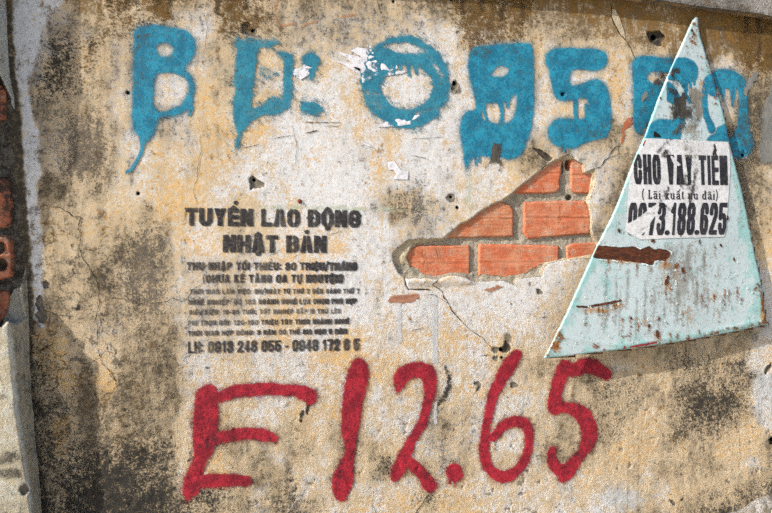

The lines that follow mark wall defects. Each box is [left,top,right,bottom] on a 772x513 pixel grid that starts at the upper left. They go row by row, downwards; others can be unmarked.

damp [30,0,178,102]
damp [207,0,274,43]
damp [447,0,536,50]
crack [611,7,646,58]
damp [730,15,772,78]
flaking render [0,77,26,340]
flaking render [393,148,597,295]
spalling [35,280,50,323]
crack [54,206,124,382]
crack [405,280,490,346]
damp [29,332,234,513]
damp [667,353,756,443]